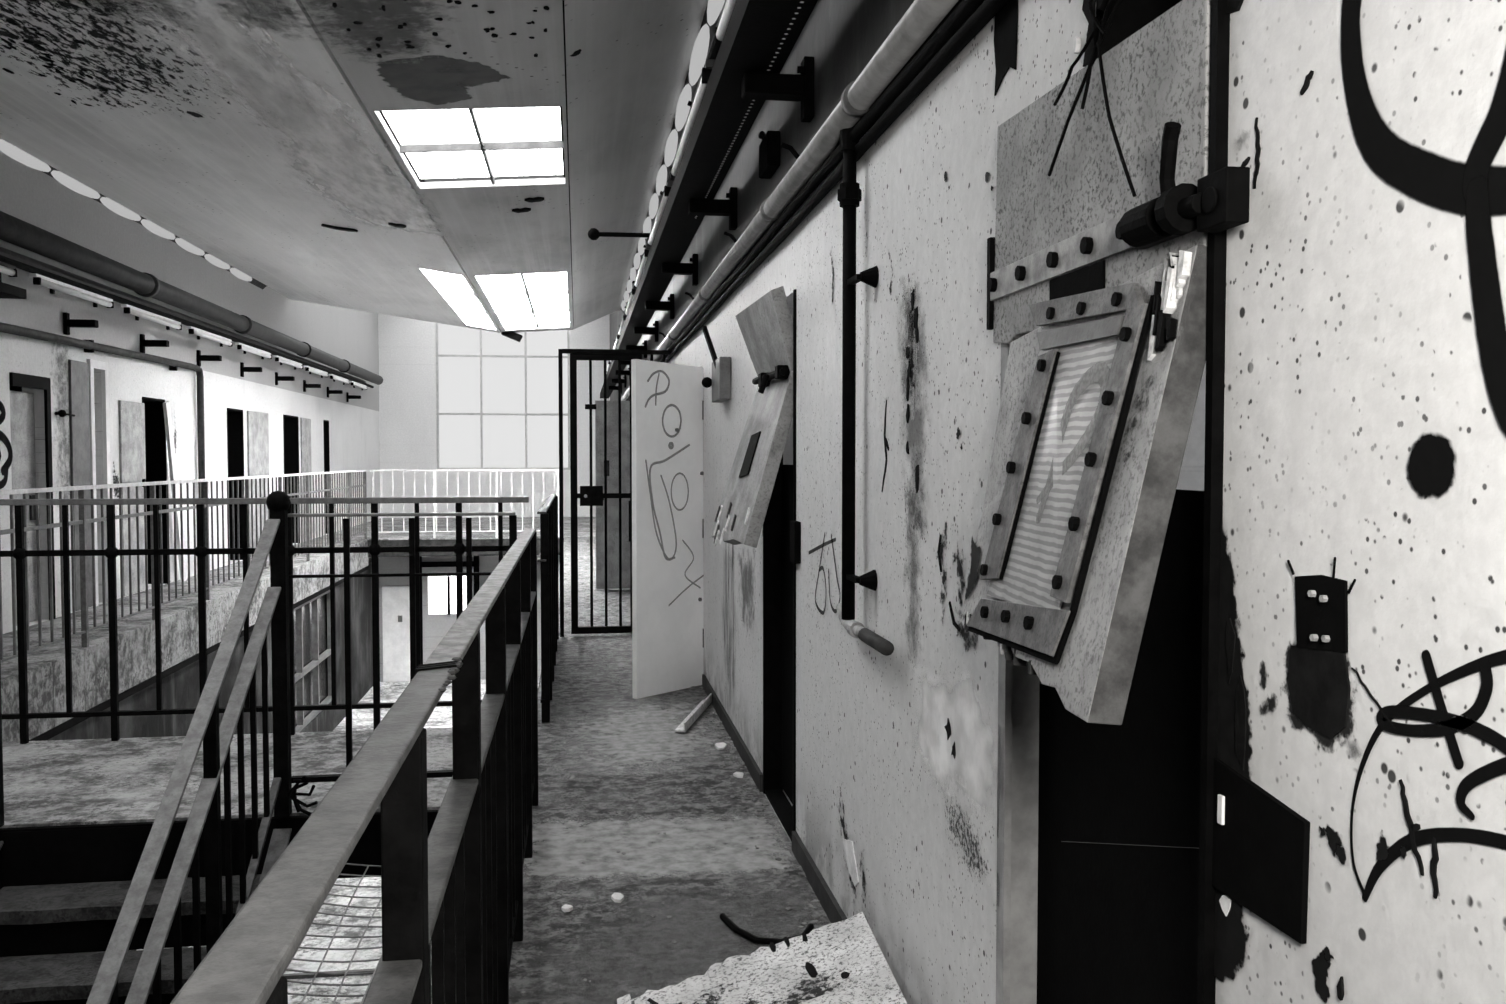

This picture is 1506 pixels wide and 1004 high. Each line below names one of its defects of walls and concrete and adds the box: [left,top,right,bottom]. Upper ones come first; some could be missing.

leakage [0,0,437,233]
leakage [377,55,510,105]
leakage [902,289,924,647]